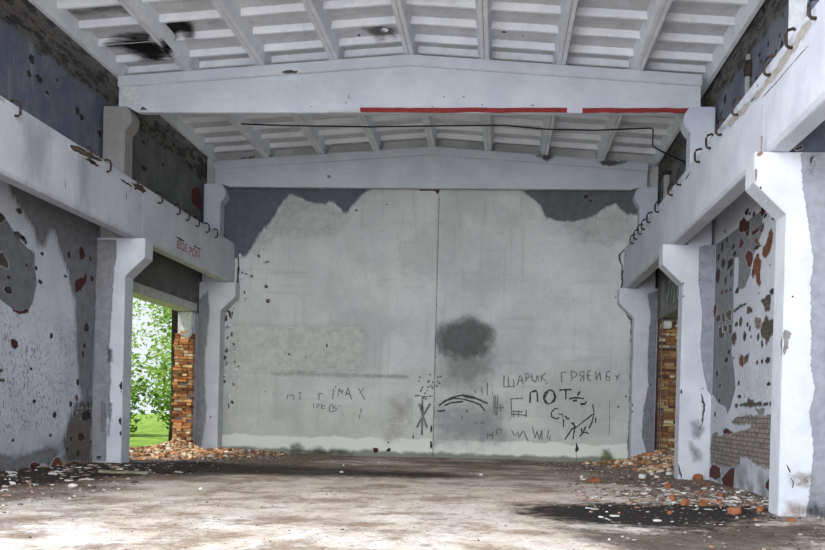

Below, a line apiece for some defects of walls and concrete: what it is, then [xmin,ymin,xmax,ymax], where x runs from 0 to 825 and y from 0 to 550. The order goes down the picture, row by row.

peeling [0,212,44,315]
peeling [698,200,792,394]
peeling [794,145,825,517]
flaking render [709,380,771,491]